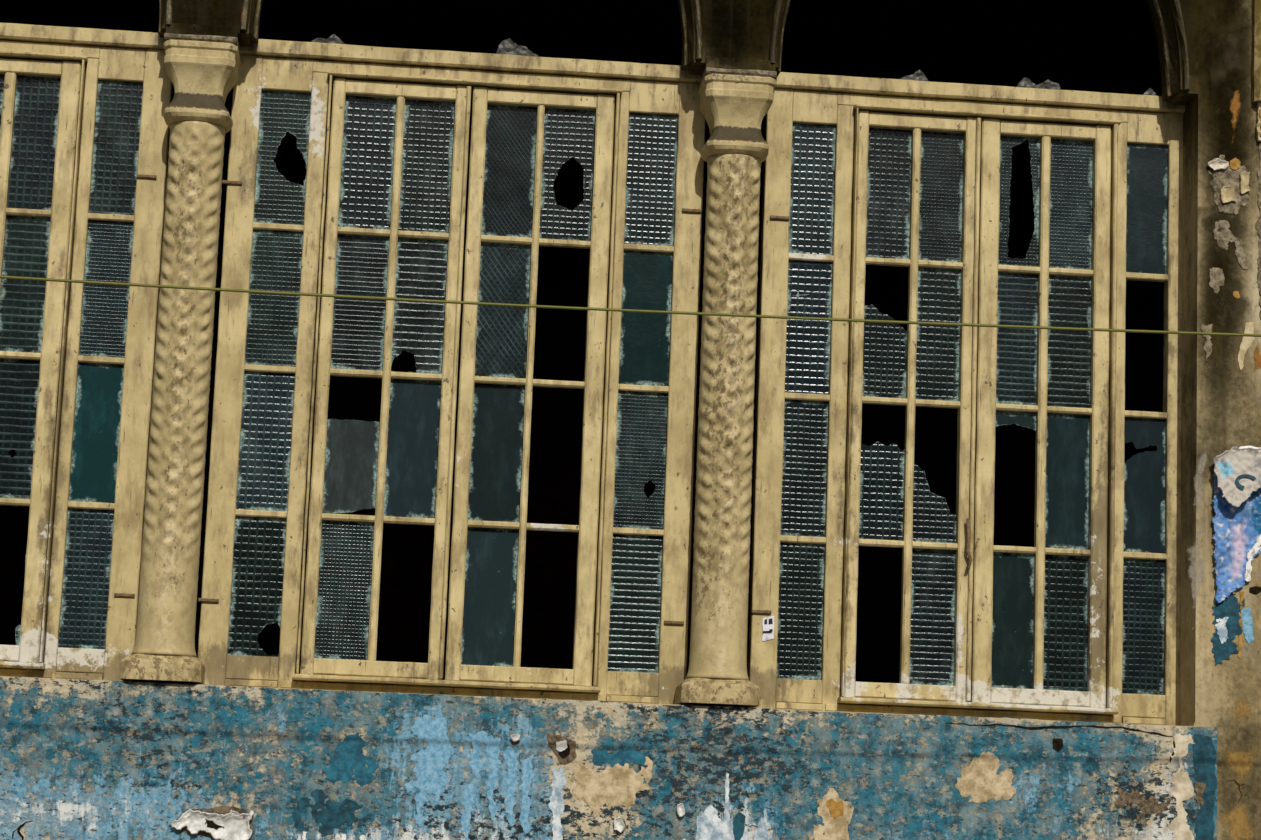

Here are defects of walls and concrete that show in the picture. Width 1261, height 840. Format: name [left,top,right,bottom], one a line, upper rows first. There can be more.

flaking render [1208,102,1261,370]
flaking render [1200,324,1213,361]
peeling [171,805,254,840]
peeling [291,732,378,835]
peeling [404,715,534,840]
peeling [547,733,653,835]
peeling [677,773,768,840]
peeling [955,752,1016,803]
spalling [1053,739,1063,751]
peeling [1114,733,1217,840]